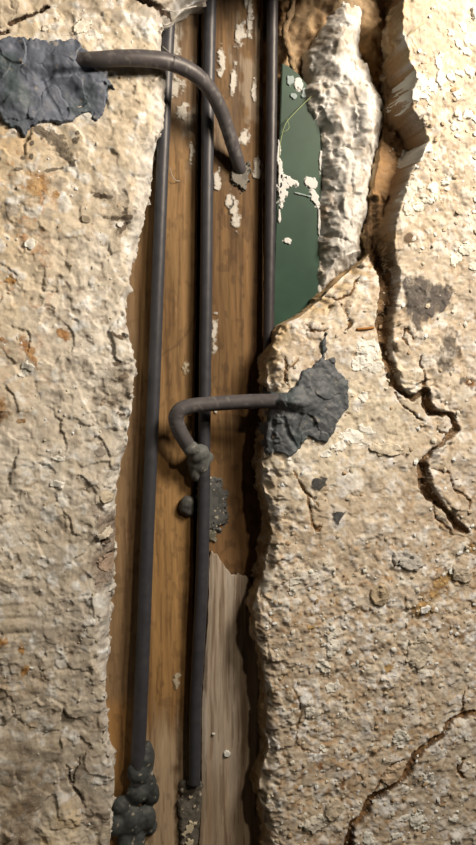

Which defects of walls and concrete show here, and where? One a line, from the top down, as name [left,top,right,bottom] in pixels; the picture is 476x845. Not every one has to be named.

peeling [235,0,254,46]
peeling [172,74,189,120]
peeling [217,49,237,96]
peeling [286,76,307,100]
peeling [238,129,251,145]
spalling [111,206,133,233]
peeling [214,167,241,227]
peeling [277,140,322,239]
leakage [403,276,452,331]
spalling [101,362,133,416]
crack [306,196,472,535]
crack [344,690,476,845]